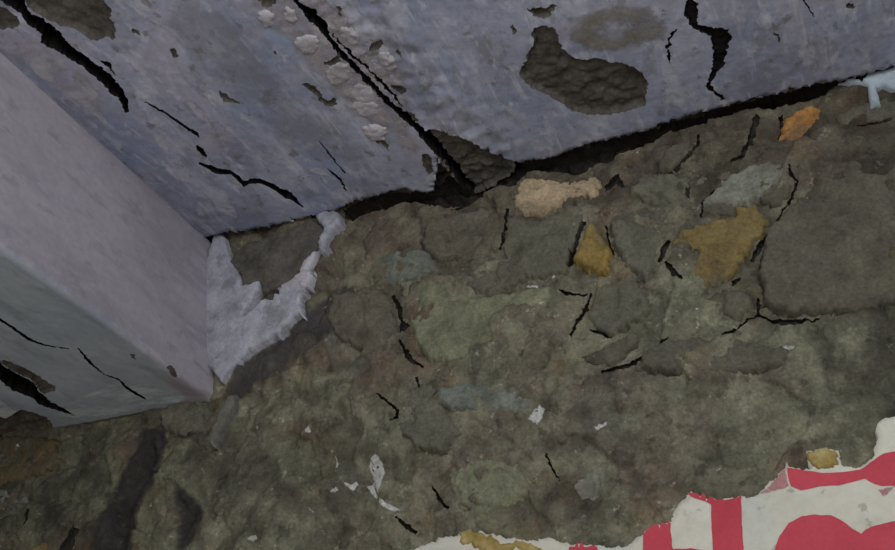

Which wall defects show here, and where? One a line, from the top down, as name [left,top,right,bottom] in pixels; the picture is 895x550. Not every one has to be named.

crack [1,0,316,219]
spalling [519,4,649,116]
crack [293,0,894,221]
crack [0,362,75,416]
crack [0,318,146,399]
peeling [206,216,324,385]
spalling [514,177,602,220]
crack [559,289,610,338]
spalling [673,204,770,289]
spalling [757,160,895,320]
leakage [92,429,166,550]
leakage [175,489,203,550]